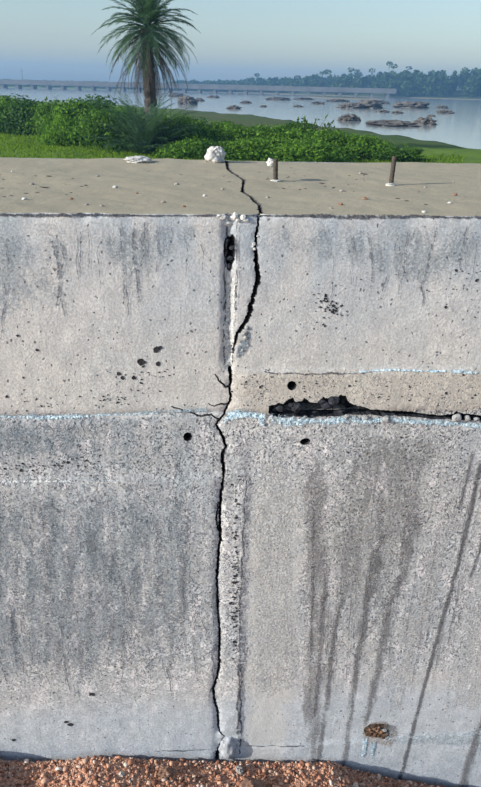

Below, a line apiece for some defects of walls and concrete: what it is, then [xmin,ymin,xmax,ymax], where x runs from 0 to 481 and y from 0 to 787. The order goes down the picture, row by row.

spalling [216,212,249,271]
crack [156,161,304,760]
spalling [268,374,481,427]
damp [303,468,421,762]
damp [386,453,481,787]